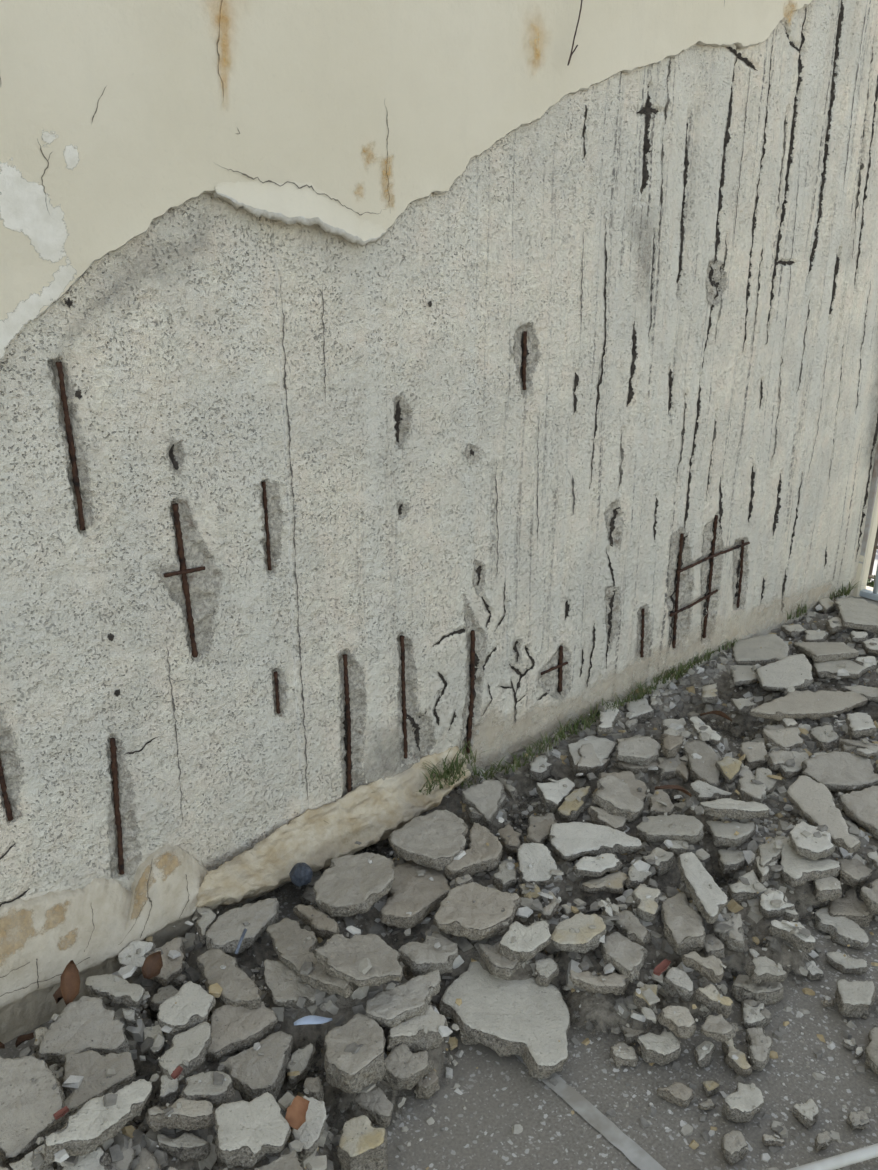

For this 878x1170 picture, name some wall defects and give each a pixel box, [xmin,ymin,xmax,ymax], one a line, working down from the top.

crack [280,286,309,809]
peeling [0,0,878,904]
crack [410,467,550,734]
crack [534,415,542,543]
crack [565,549,615,687]
crack [572,58,690,514]
crack [653,0,878,610]
peeling [212,881,291,917]